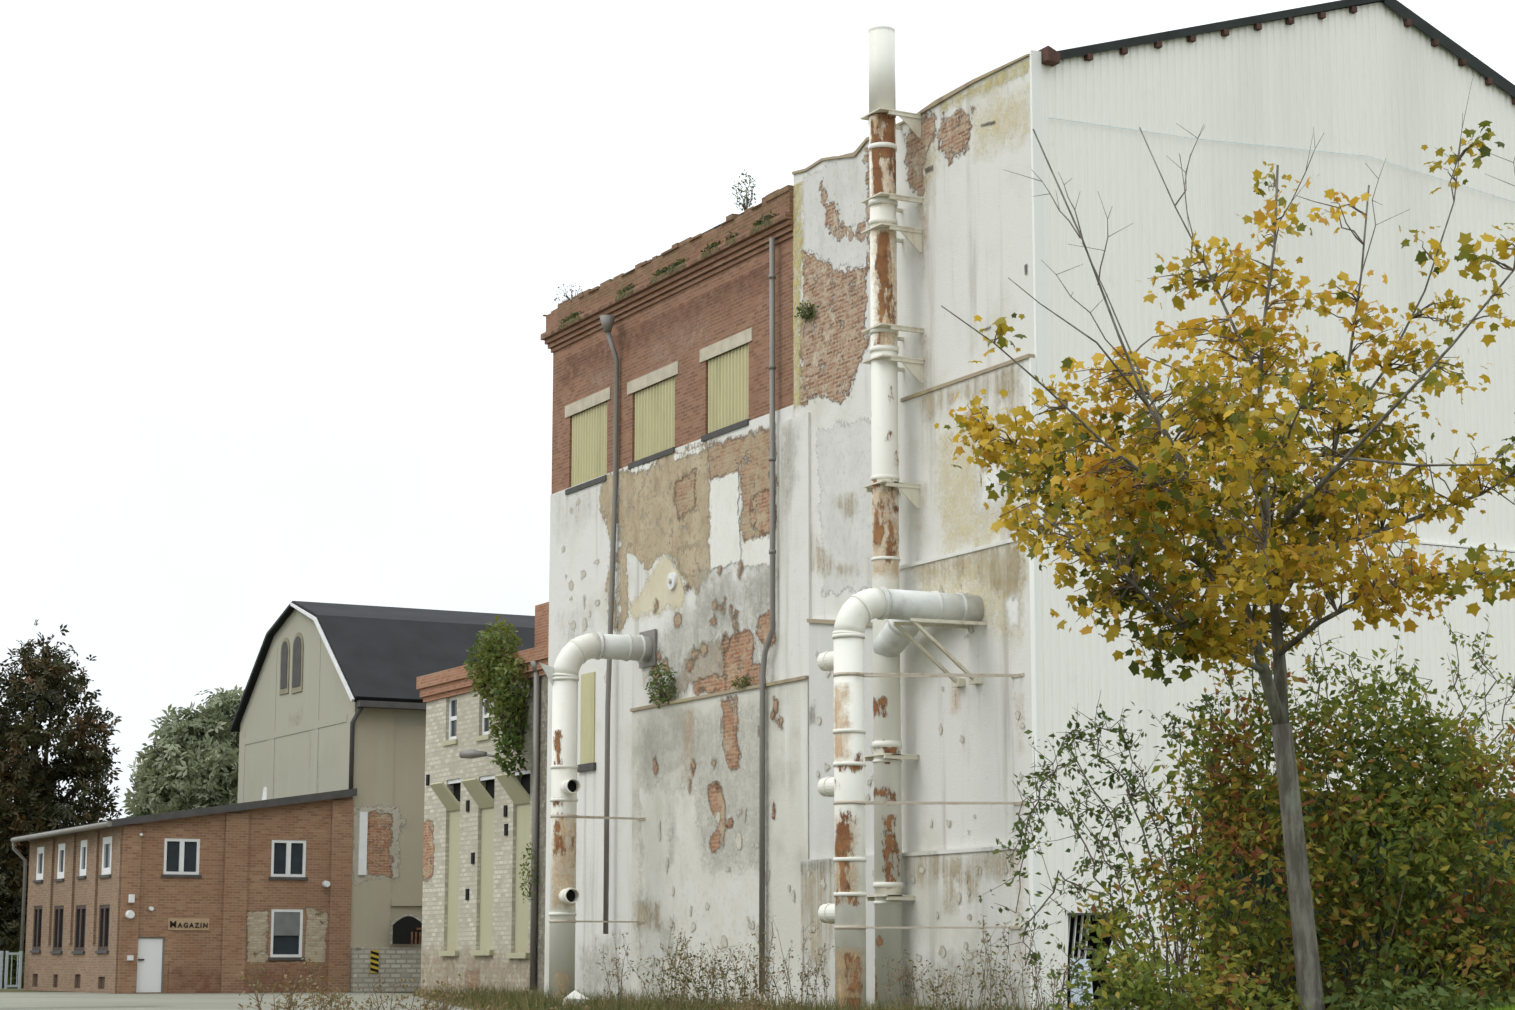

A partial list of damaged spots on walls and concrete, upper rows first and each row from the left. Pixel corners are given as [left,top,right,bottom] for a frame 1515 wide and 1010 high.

corrosion [868,112,896,204]
flaking render [934,106,975,166]
flaking render [797,147,870,407]
corrosion [874,228,896,345]
corrosion [871,431,899,572]
flaking render [565,426,783,853]
corrosion [834,687,900,790]
corrosion [835,811,859,906]
corrosion [873,787,900,888]
flaking render [747,917,773,943]
corrosion [837,951,878,1010]